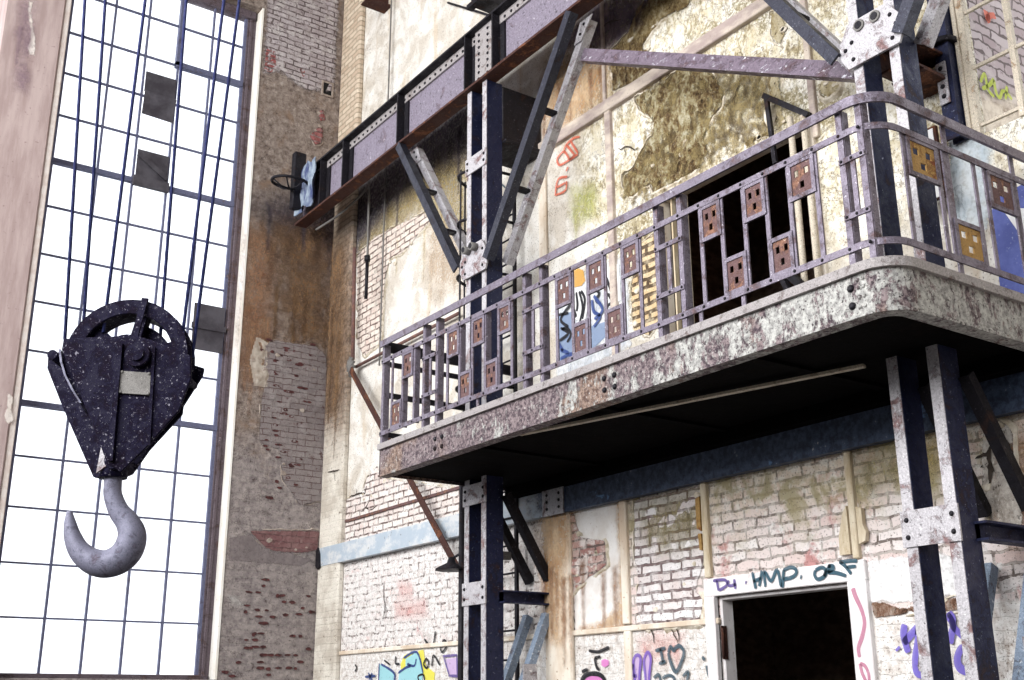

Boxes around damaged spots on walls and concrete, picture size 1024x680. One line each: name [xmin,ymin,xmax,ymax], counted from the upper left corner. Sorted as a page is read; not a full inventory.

flaking render [264,0,339,91]
spalling [611,0,689,51]
spalling [769,10,787,47]
spalling [608,66,727,200]
spalling [745,77,786,146]
peeling [818,81,845,104]
water stain [267,207,345,424]
spalling [355,211,431,359]
spalling [250,337,327,505]
corrosion [541,513,584,638]
spalling [570,513,610,598]
corrosion [592,565,623,629]